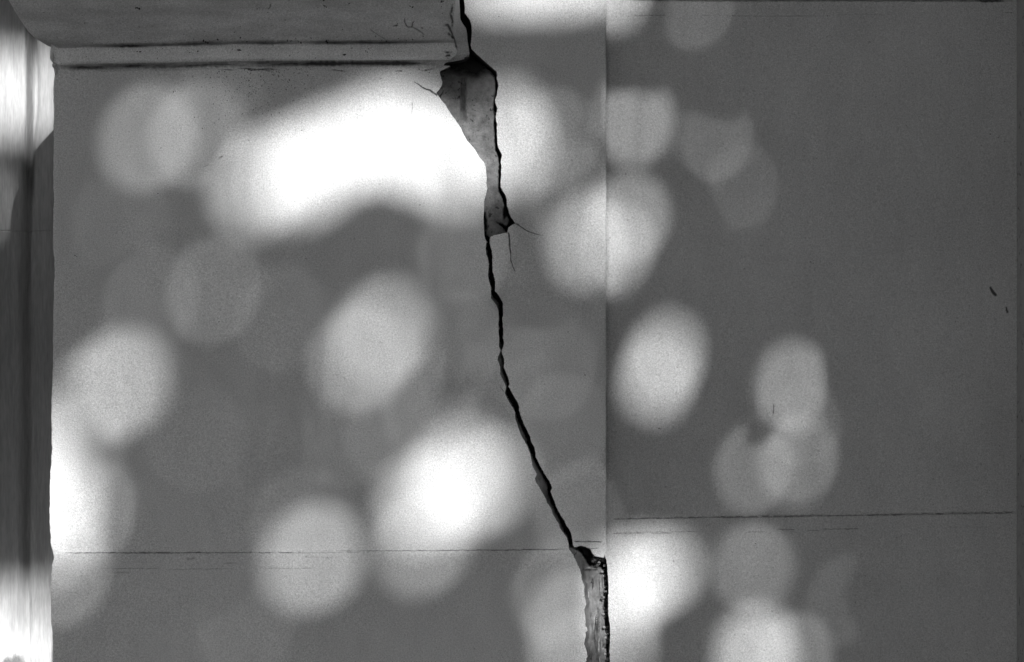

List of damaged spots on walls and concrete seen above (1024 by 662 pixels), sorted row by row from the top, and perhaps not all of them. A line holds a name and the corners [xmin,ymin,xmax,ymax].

crack [459,0,472,55]
spalling [415,49,539,271]
crack [406,234,599,551]
crack [86,548,307,556]
spalling [569,545,610,662]